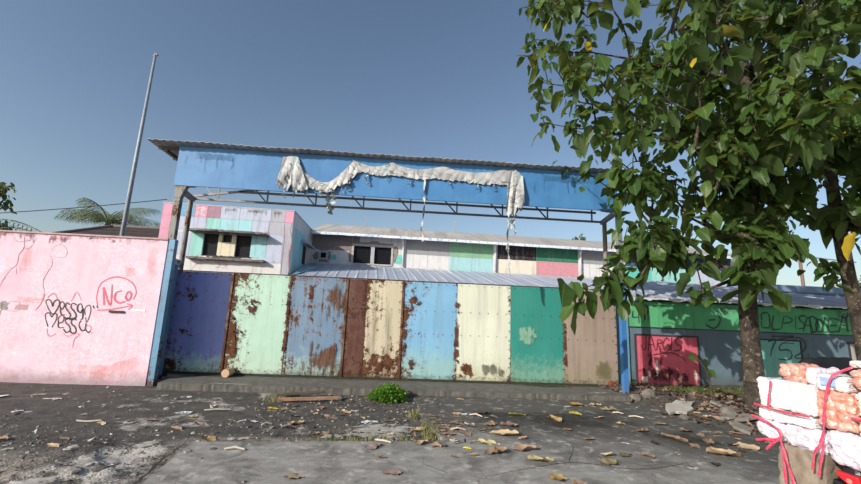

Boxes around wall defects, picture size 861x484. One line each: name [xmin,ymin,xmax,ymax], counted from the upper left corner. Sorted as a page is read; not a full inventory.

corrosion [225,286,259,364]
corrosion [282,275,293,367]
corrosion [302,342,336,371]
corrosion [326,286,340,319]
corrosion [365,328,414,374]
corrosion [453,302,504,378]
peeling [519,327,537,345]